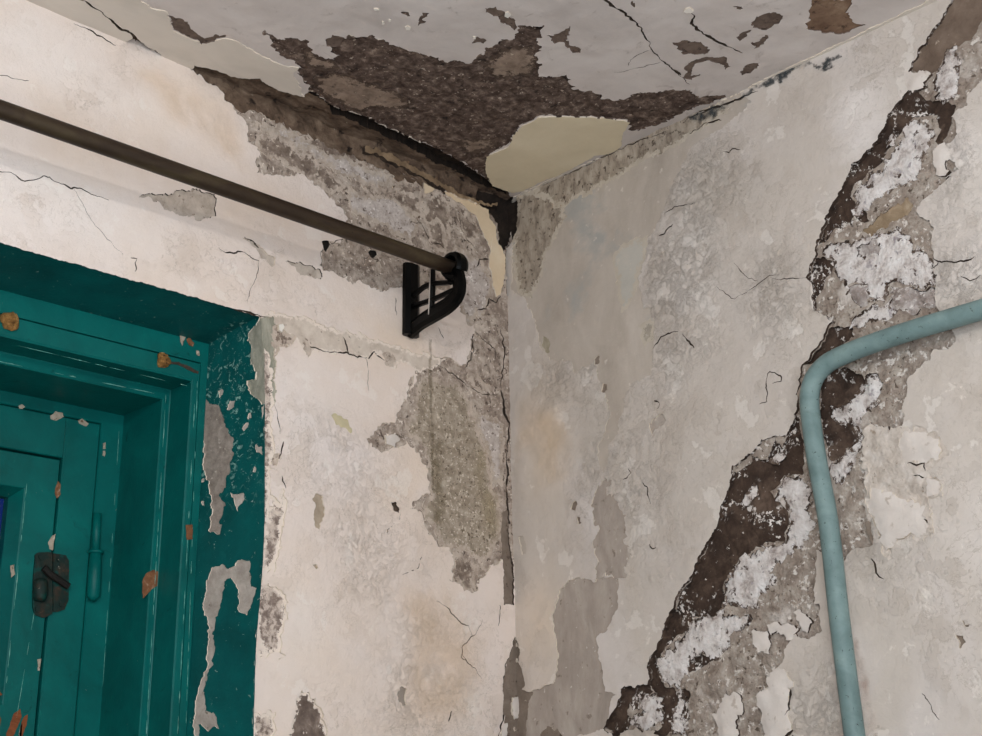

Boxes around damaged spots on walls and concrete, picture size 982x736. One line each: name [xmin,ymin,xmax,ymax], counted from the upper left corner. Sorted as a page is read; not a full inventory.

crack [609,1,681,74]
crack [683,7,711,36]
crack [360,114,518,310]
peeling [139,0,927,593]
flaking render [500,0,982,736]
peeling [142,570,158,598]
crack [501,510,513,605]
peeling [193,560,288,736]
peeling [288,692,326,736]
peeling [397,686,405,706]